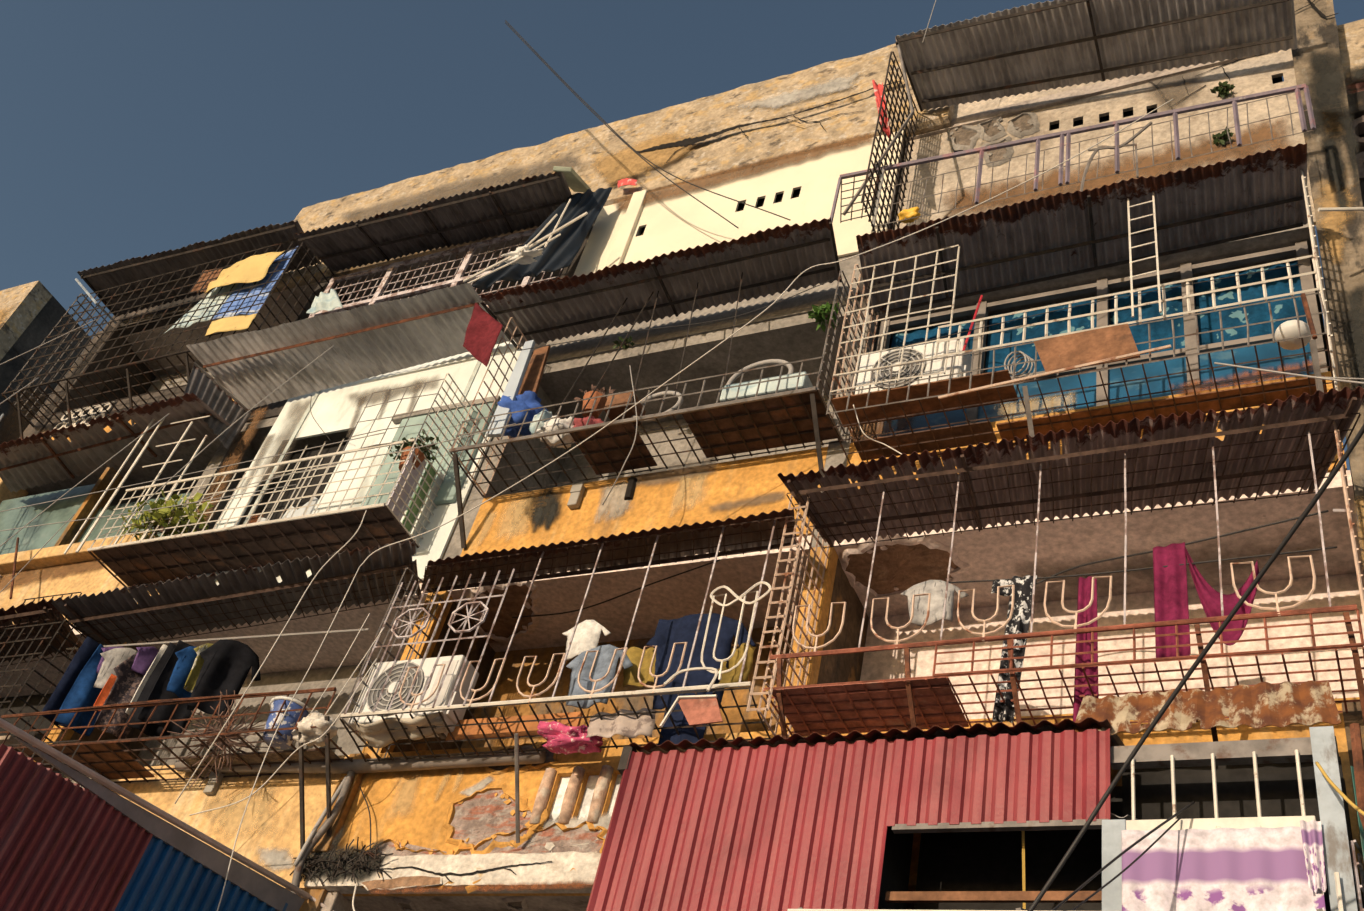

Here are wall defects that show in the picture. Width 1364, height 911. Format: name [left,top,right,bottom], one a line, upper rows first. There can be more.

crack [637,81,899,161]
flaking render [838,534,970,599]
flaking render [366,740,608,856]
peeling [359,875,482,893]